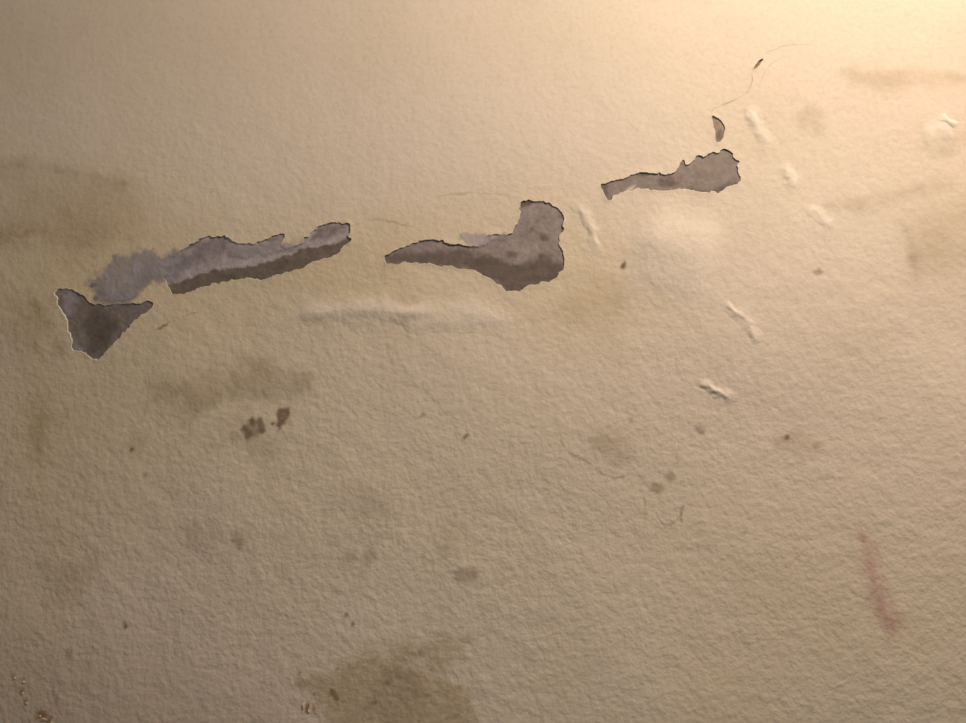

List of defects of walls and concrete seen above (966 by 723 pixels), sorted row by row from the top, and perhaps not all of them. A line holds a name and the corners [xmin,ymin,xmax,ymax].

peeling [601,116,741,201]
peeling [384,199,565,291]
peeling [54,222,351,361]